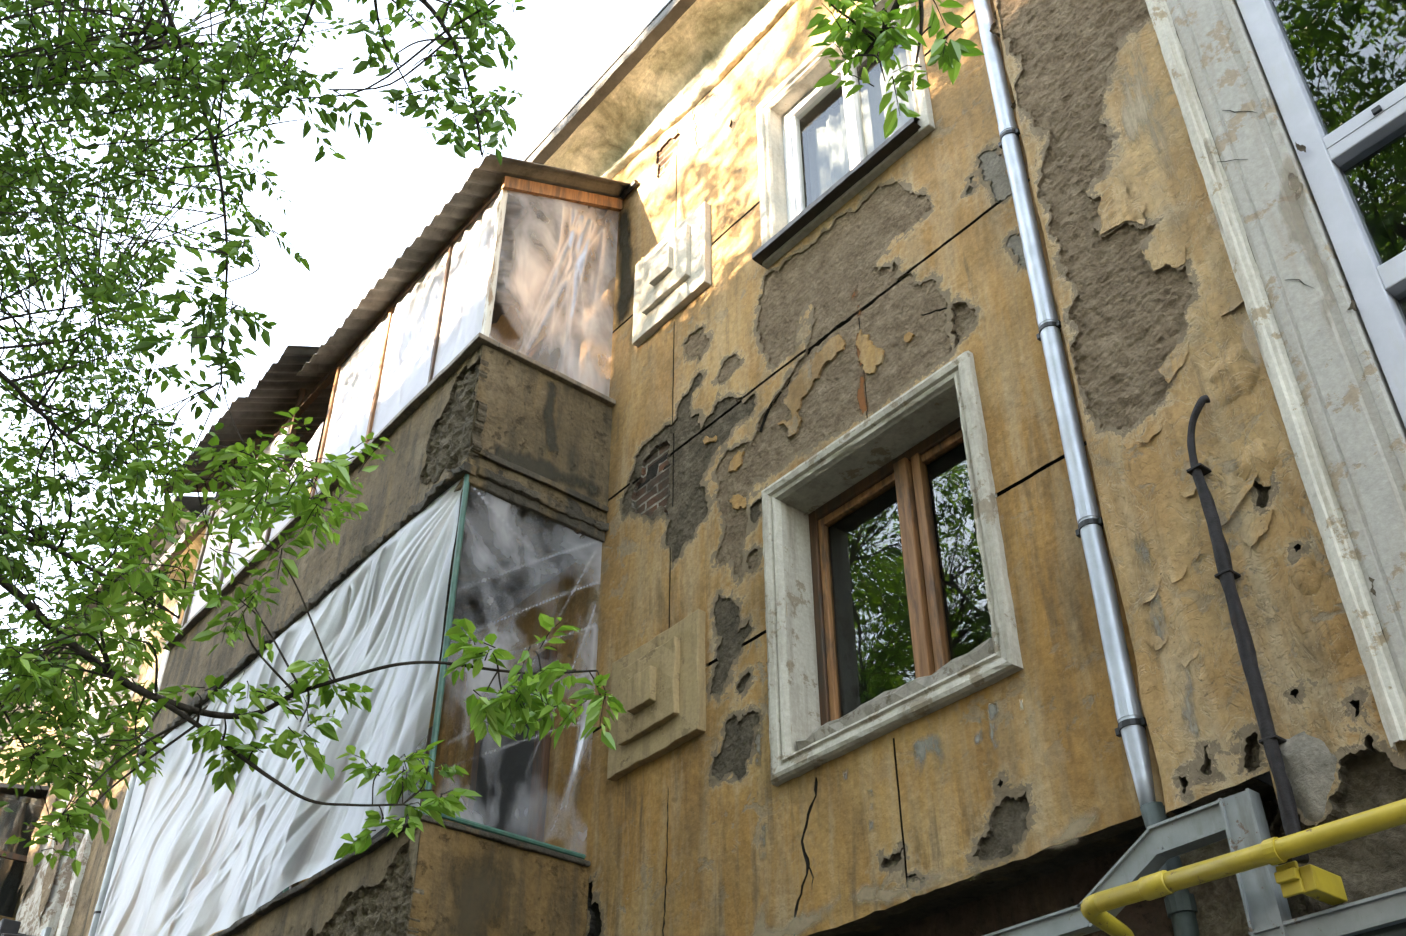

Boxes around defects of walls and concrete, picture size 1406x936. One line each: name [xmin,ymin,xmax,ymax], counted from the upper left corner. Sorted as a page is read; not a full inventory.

flaking render [656,94,735,178]
flaking render [965,148,1012,203]
flaking render [990,0,1193,443]
spalling [420,354,489,485]
flaking render [622,181,977,578]
flaking render [710,594,752,696]
spalling [305,831,424,936]
flaking render [711,710,761,781]
crack [793,777,818,936]
flaking render [973,780,1030,861]
flaking render [1269,734,1406,838]
flaking render [1278,824,1406,919]